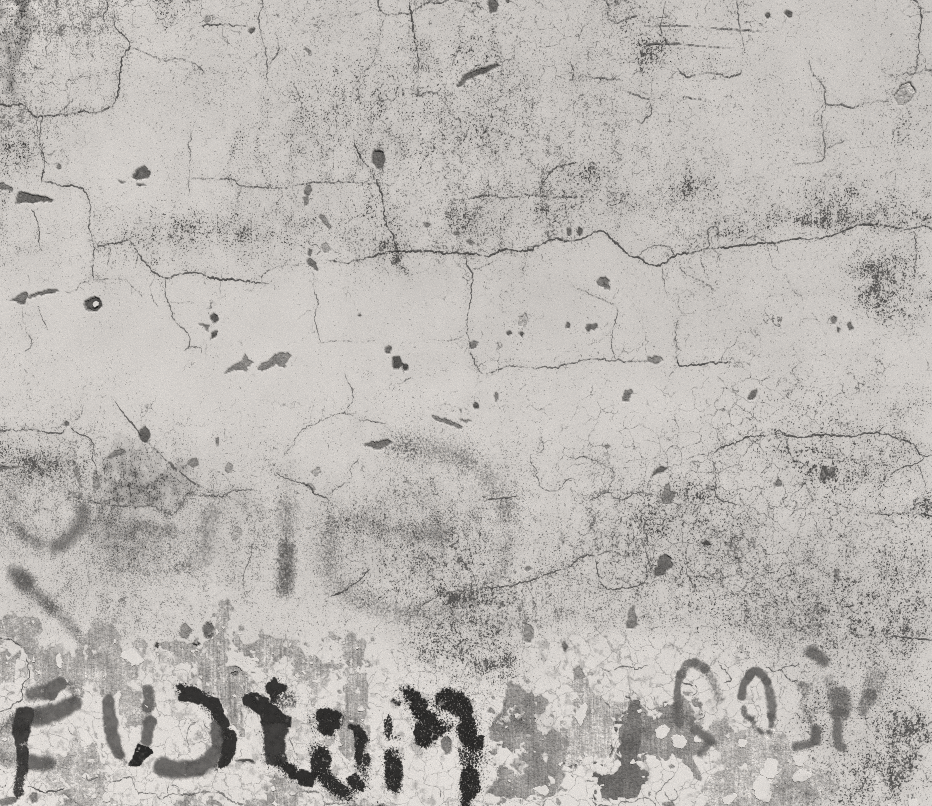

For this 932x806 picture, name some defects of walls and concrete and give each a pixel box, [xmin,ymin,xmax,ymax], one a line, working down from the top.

spalling [0,183,52,203]
crack [0,0,275,353]
crack [187,0,932,376]
spalling [14,289,57,304]
spalling [228,353,291,372]
crack [276,375,386,518]
crack [686,425,930,505]
crack [0,637,30,712]
peeling [0,600,374,760]
peeling [30,727,123,806]
crack [28,766,244,805]
peeling [487,667,840,806]